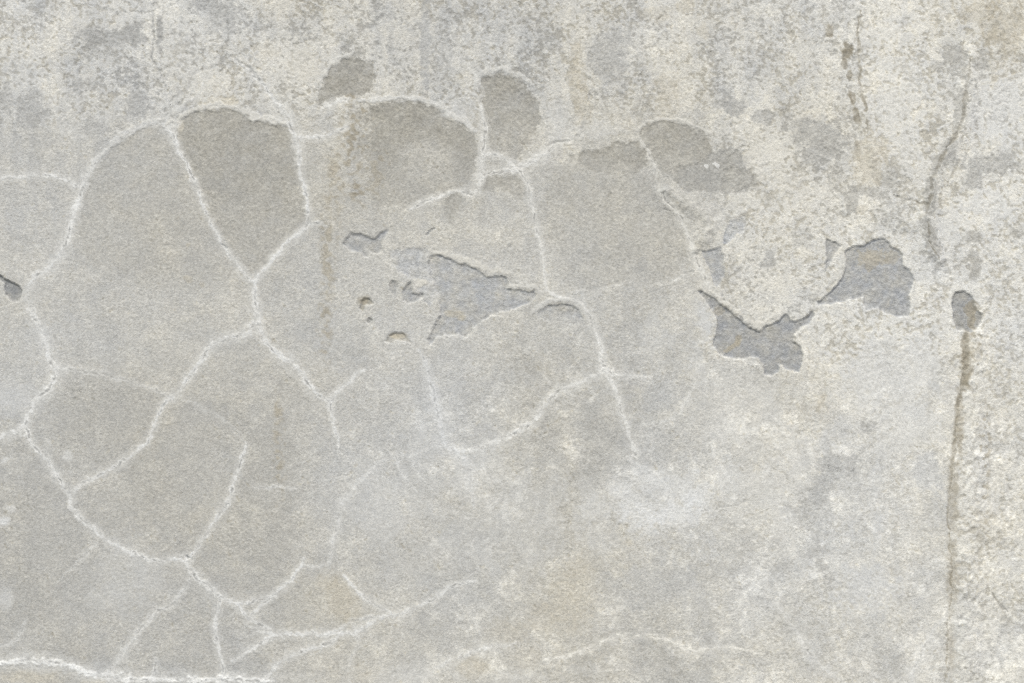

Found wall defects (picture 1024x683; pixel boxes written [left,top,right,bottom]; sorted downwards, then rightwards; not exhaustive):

peeling [315,51,759,347]
spalling [0,274,22,304]
crack [0,0,727,683]
spalling [697,215,915,376]
spalling [950,290,983,332]
leakage [337,293,973,631]
crack [542,631,775,663]